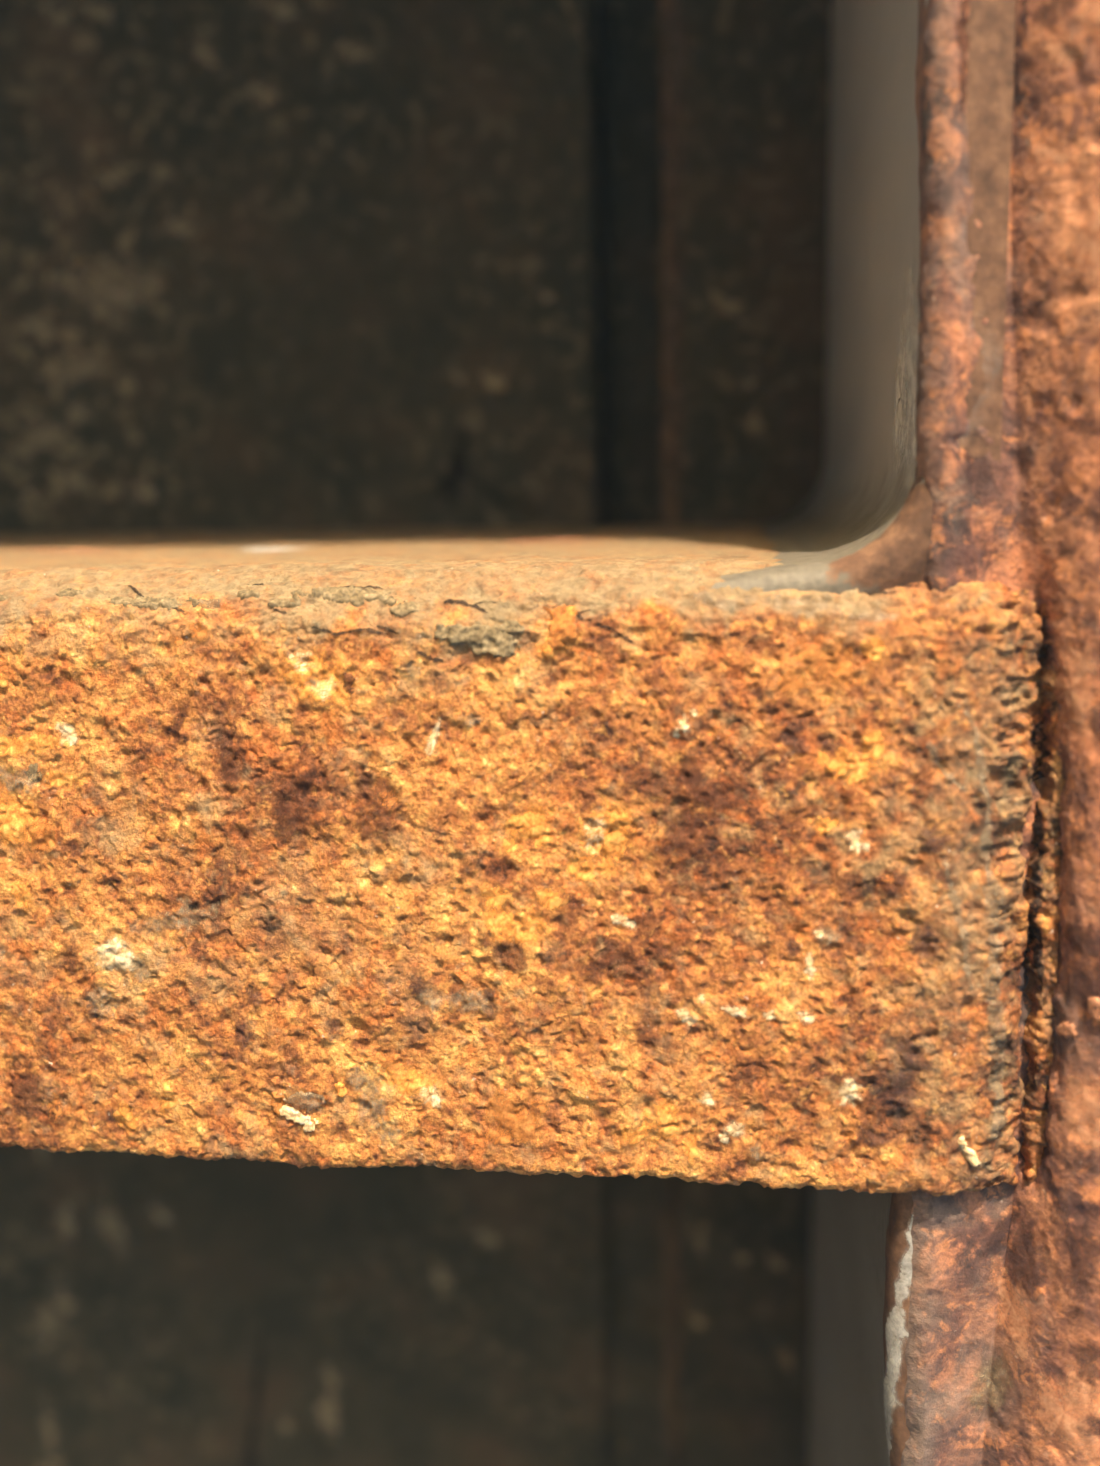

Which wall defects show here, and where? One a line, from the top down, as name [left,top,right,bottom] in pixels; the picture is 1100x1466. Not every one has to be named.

corrosion [279,648,355,707]
corrosion [781,727,885,784]
corrosion [0,770,86,850]
corrosion [478,800,632,971]
corrosion [814,816,869,852]
crack [1023,721,1050,993]
corrosion [271,1082,347,1132]
corrosion [620,1099,699,1162]
corrosion [832,1074,860,1105]
corrosion [957,1136,981,1167]
crack [1021,1099,1078,1261]
corrosion [1032,1345,1100,1459]